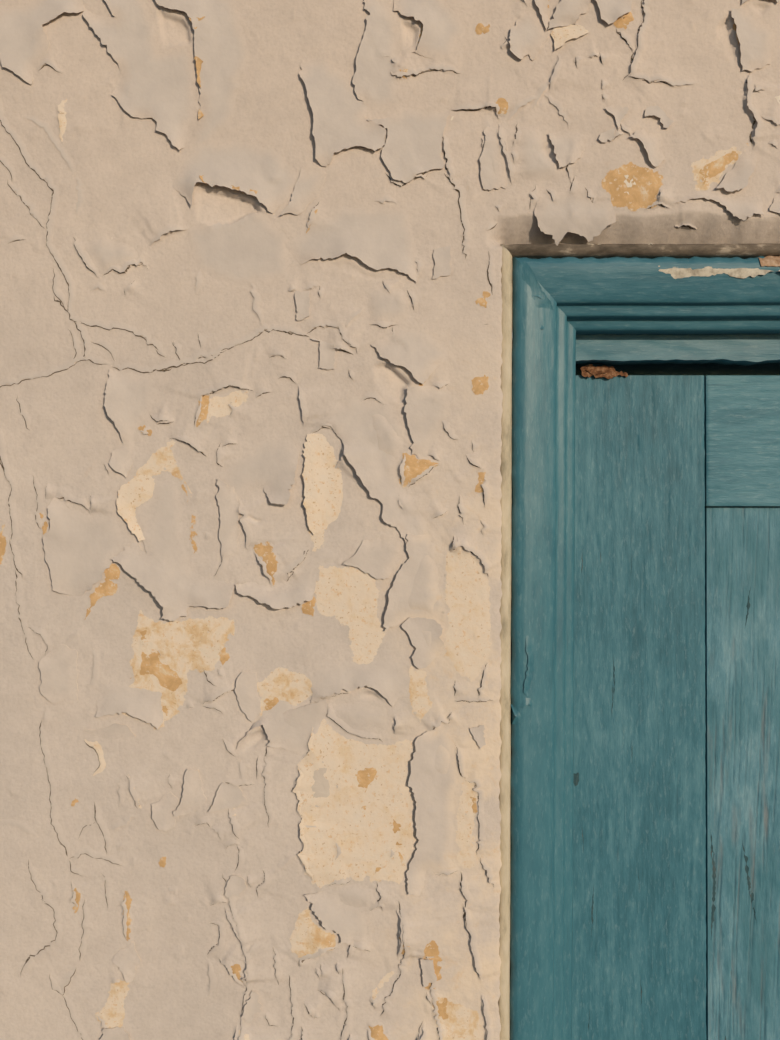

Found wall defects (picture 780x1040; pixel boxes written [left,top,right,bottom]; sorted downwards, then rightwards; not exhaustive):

peeling [0,0,698,325]
peeling [646,0,780,221]
peeling [658,256,780,279]
peeling [28,280,496,1040]
crack [0,720,125,1040]